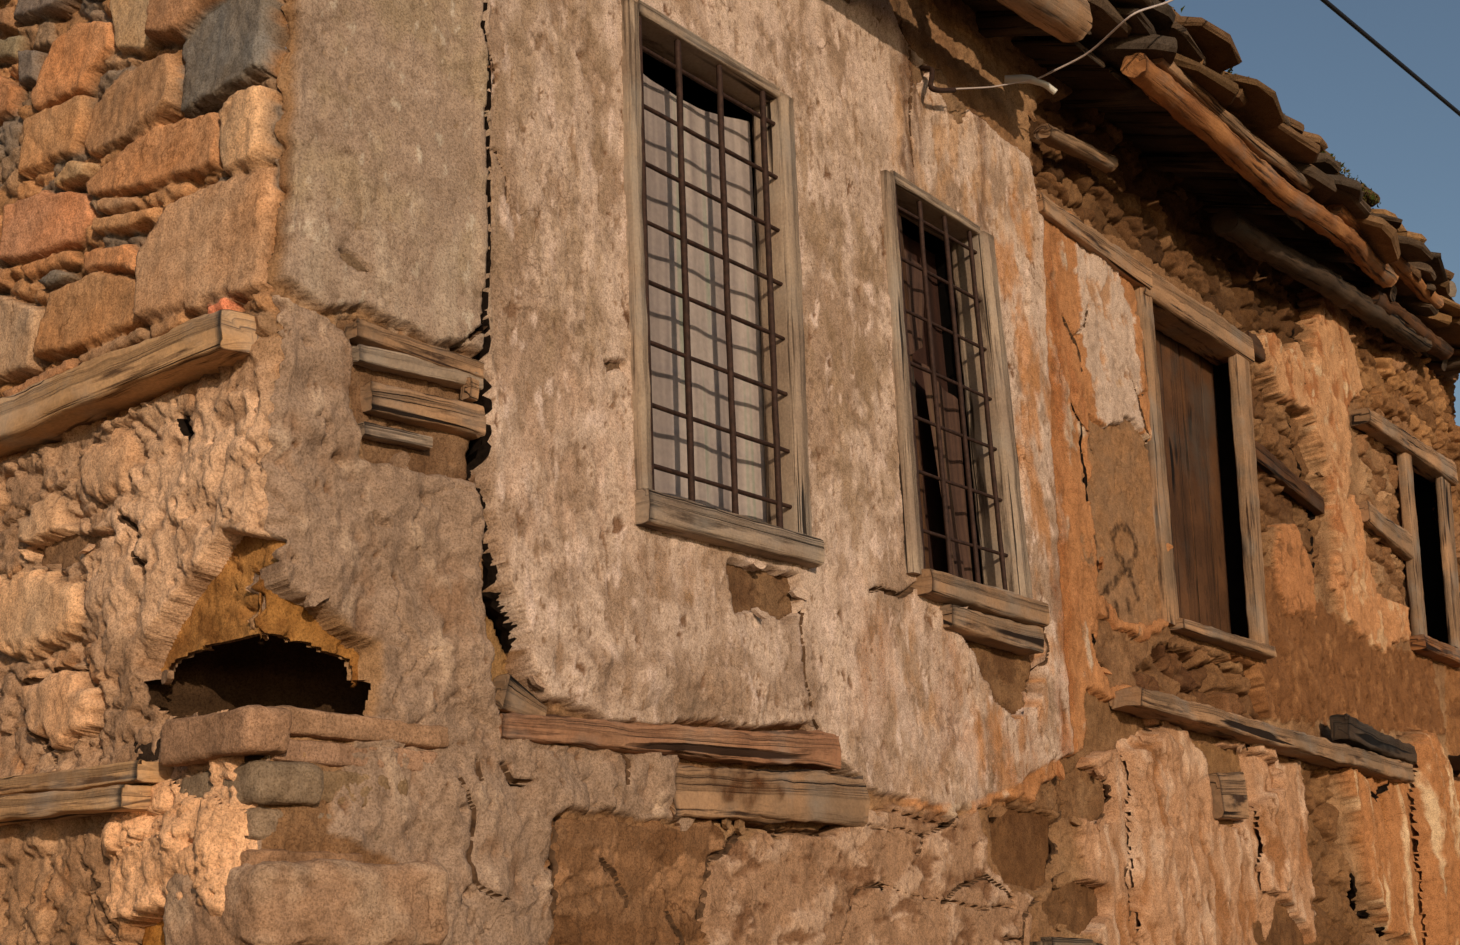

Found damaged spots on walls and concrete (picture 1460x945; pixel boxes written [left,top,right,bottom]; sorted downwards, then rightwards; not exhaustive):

crack [450,2,517,653]
crack [1062,310,1093,502]
flaking render [1250,366,1325,577]
spalling [146,535,371,718]
flaking render [726,561,810,620]
flaking render [965,640,1036,720]
flaking render [988,418,1259,935]
crack [458,759,532,901]
crack [547,815,562,918]
flaking render [544,815,825,945]
crack [664,823,829,945]
crack [835,808,1039,945]